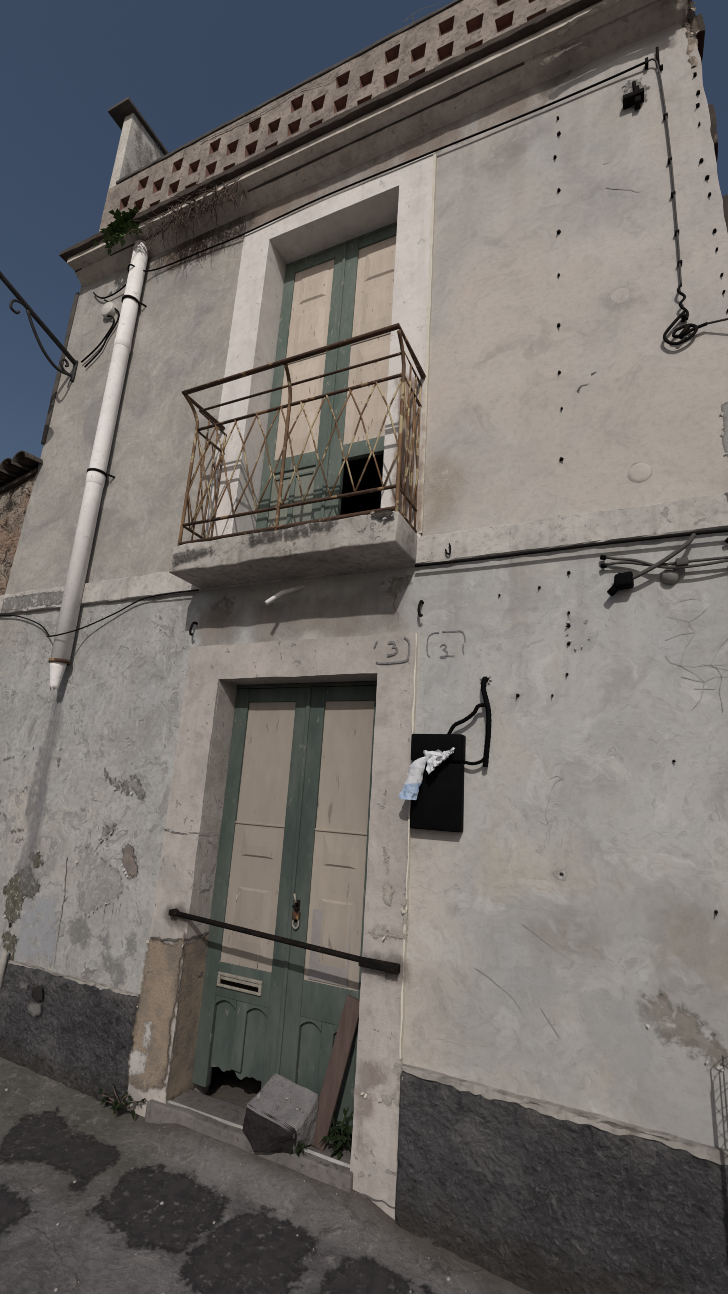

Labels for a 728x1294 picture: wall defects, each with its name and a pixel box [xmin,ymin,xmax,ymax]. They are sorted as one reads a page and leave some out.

flaking render [720,402,728,457]
flaking render [75,823,138,891]
flaking render [127,932,209,1101]
flaking render [640,992,728,1071]